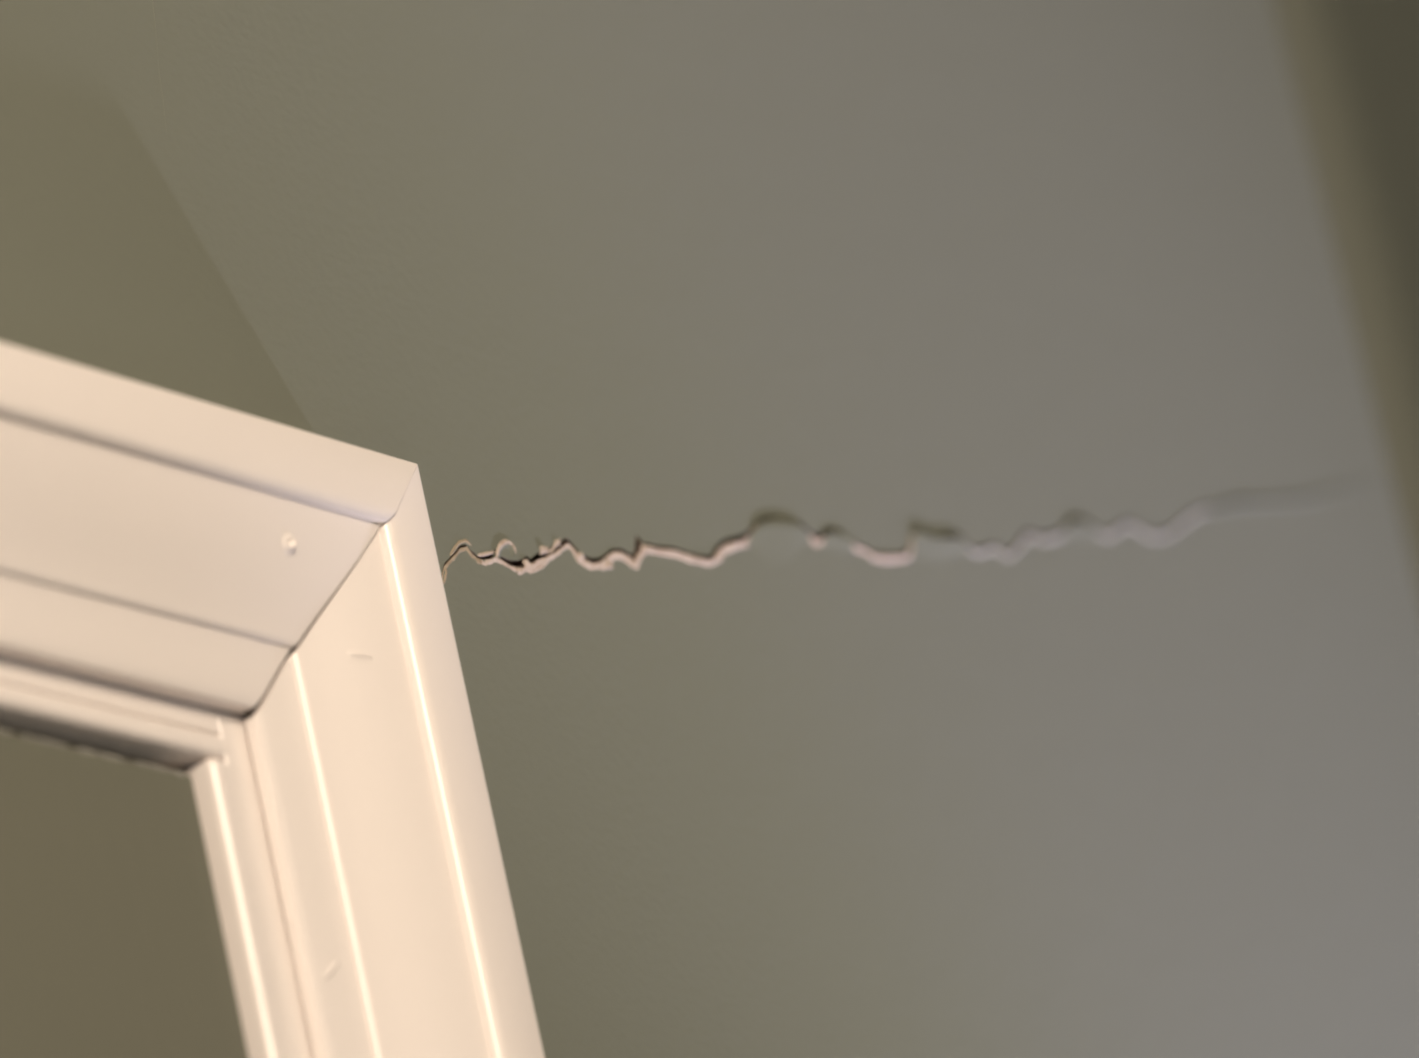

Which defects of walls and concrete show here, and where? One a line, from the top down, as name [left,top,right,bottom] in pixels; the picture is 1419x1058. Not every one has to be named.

crack [441,480,1375,585]